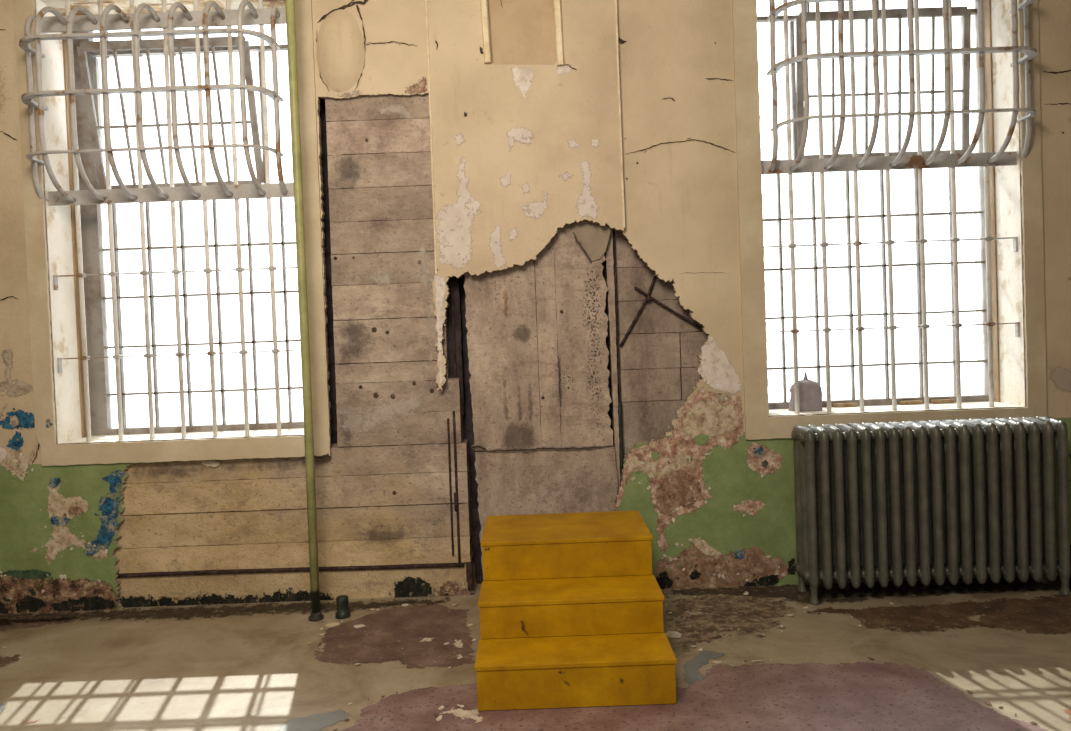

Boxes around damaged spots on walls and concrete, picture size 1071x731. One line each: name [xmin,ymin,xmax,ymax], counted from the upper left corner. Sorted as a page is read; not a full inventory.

crack [315,0,439,92]
peeling [510,66,533,97]
crack [1042,68,1071,76]
crack [1044,100,1071,108]
crack [0,131,18,141]
crack [625,137,736,155]
peeling [0,349,53,481]
spalling [277,77,1071,731]
spalling [0,456,311,631]